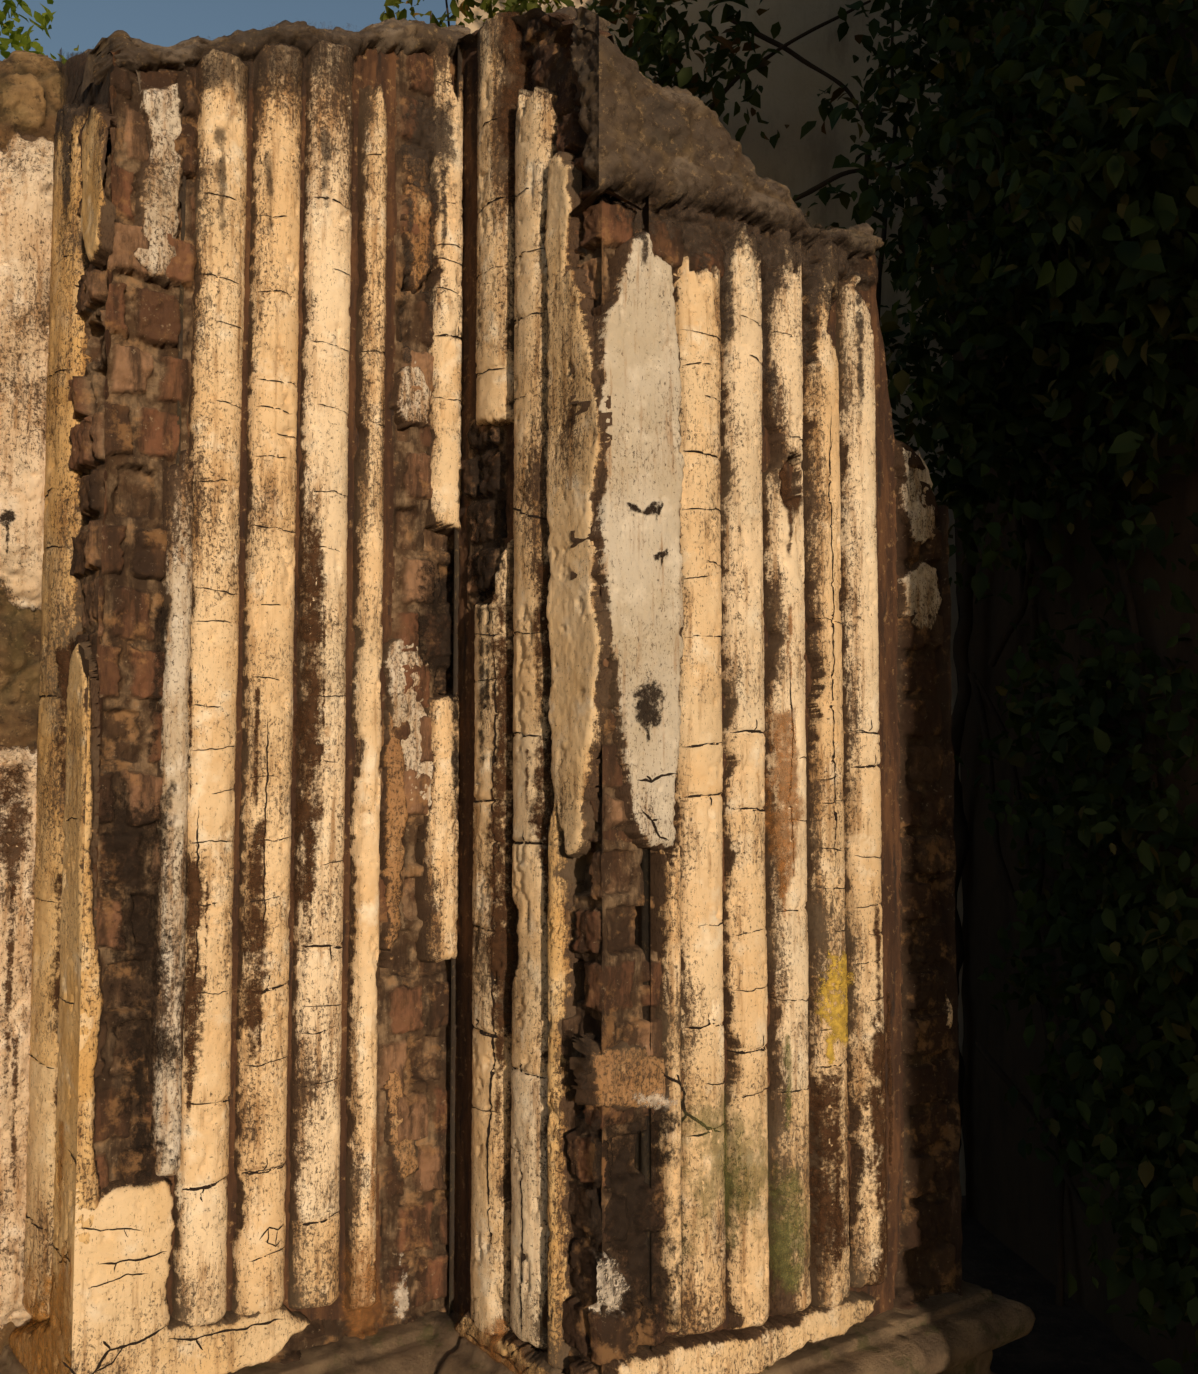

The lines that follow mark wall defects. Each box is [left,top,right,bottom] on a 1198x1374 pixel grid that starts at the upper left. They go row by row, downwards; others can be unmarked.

spalling [392,50,458,392]
crack [26,1213,166,1289]
spalling [68,66,200,1189]
crack [62,1319,280,1374]
crack [249,1211,339,1262]
leakage [292,510,326,960]
spalling [243,412,507,1368]
spalling [547,690,665,1059]
spalling [542,1105,678,1374]
crack [639,403,881,964]
crack [661,984,883,1137]
spalling [893,439,956,1309]